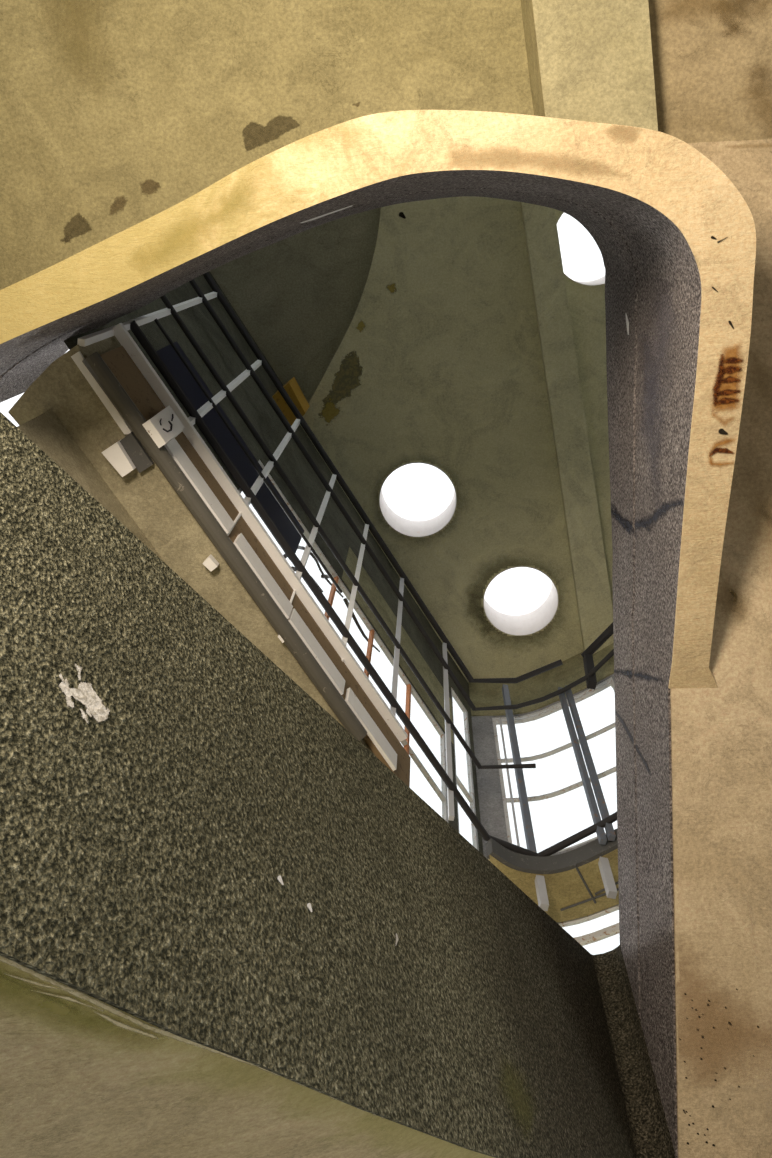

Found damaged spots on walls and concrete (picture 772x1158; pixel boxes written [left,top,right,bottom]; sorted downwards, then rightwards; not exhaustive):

corrosion [709,347,742,466]
peeling [59,664,110,724]